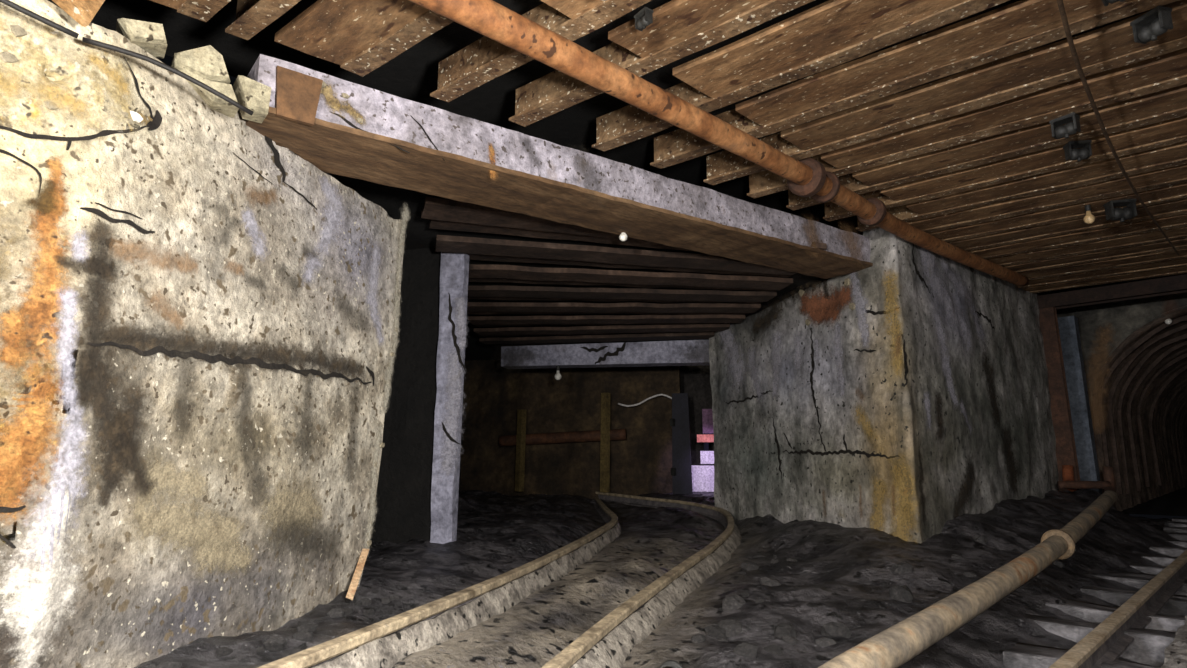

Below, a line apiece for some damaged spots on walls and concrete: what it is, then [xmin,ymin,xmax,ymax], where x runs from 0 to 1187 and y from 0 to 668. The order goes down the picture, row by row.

crack [0,56,162,193]
crack [234,136,317,210]
corrosion [0,158,68,519]
crack [88,341,375,386]
crack [448,293,466,372]
crack [580,341,627,364]
crack [442,422,460,444]
crack [725,328,908,479]
crack [0,505,26,549]